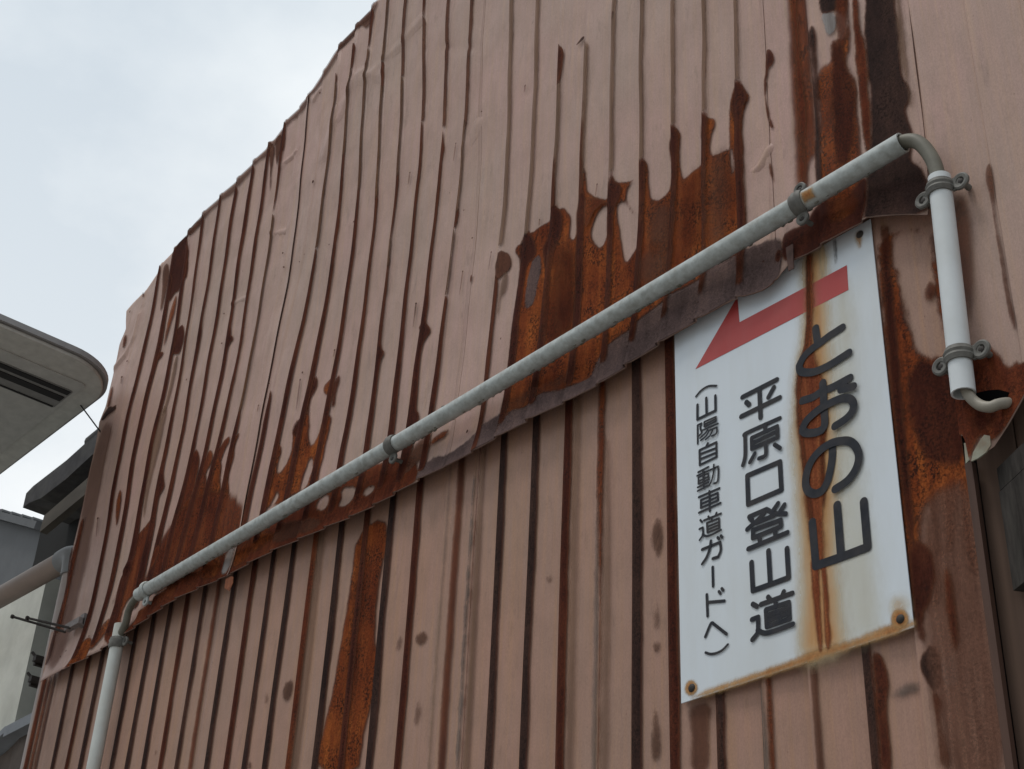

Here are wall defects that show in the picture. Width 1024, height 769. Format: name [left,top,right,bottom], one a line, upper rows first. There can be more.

corrosion [45,0,388,769]
corrosion [363,0,474,454]
corrosion [109,148,1024,769]
corrosion [484,0,749,382]
corrosion [764,49,774,128]
corrosion [788,0,912,202]